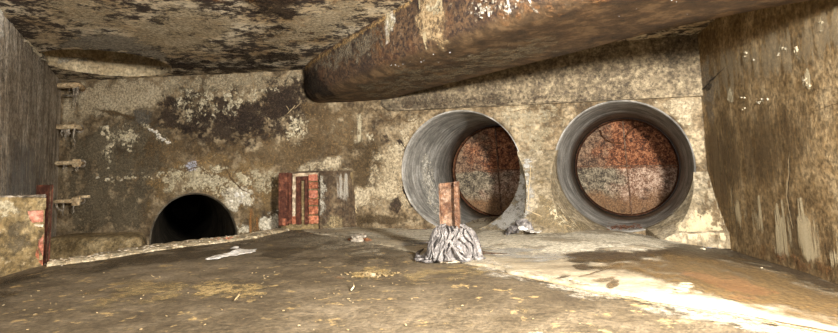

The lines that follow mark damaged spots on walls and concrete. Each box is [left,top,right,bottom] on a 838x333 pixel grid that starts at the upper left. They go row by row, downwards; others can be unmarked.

leakage [361,37,559,109]
leakage [56,0,448,280]
leakage [409,66,838,298]
leakage [0,270,43,302]
leakage [94,280,264,306]
leakage [645,301,814,333]